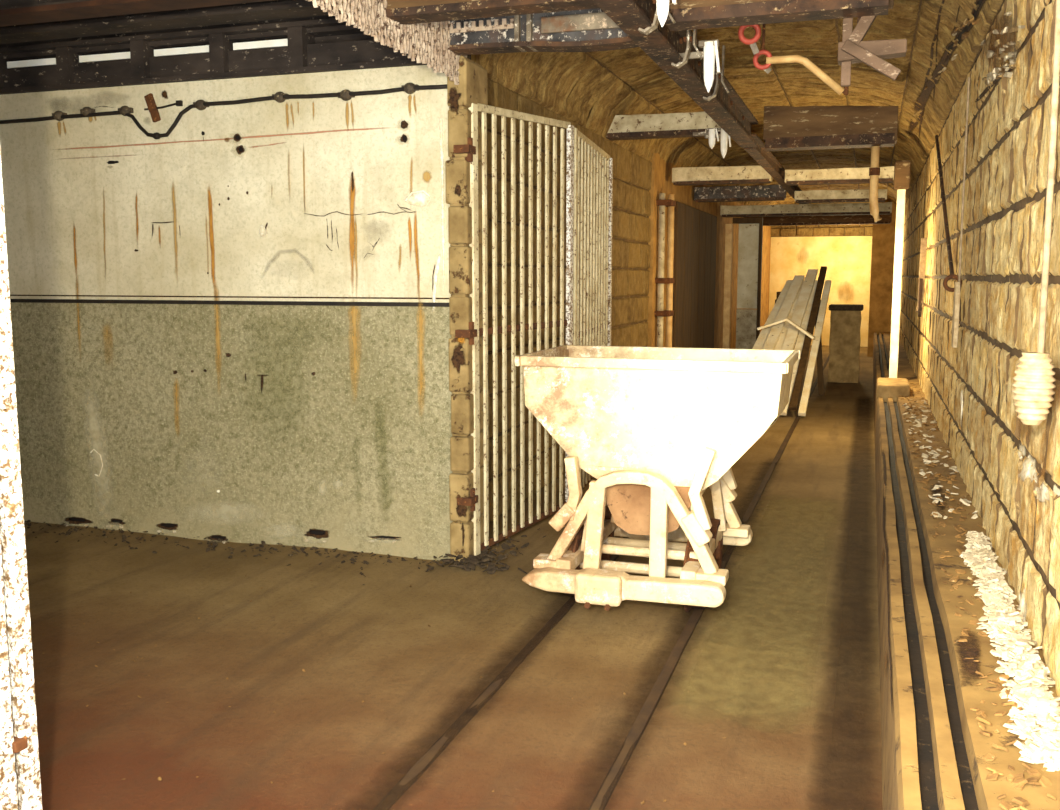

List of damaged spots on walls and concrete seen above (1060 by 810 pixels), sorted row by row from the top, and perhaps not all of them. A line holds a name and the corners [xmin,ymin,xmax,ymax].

corrosion [191,189,231,372]
corrosion [349,172,357,277]
corrosion [399,215,419,290]
damp [931,484,946,510]
damp [1018,595,1026,625]
damp [957,631,980,682]